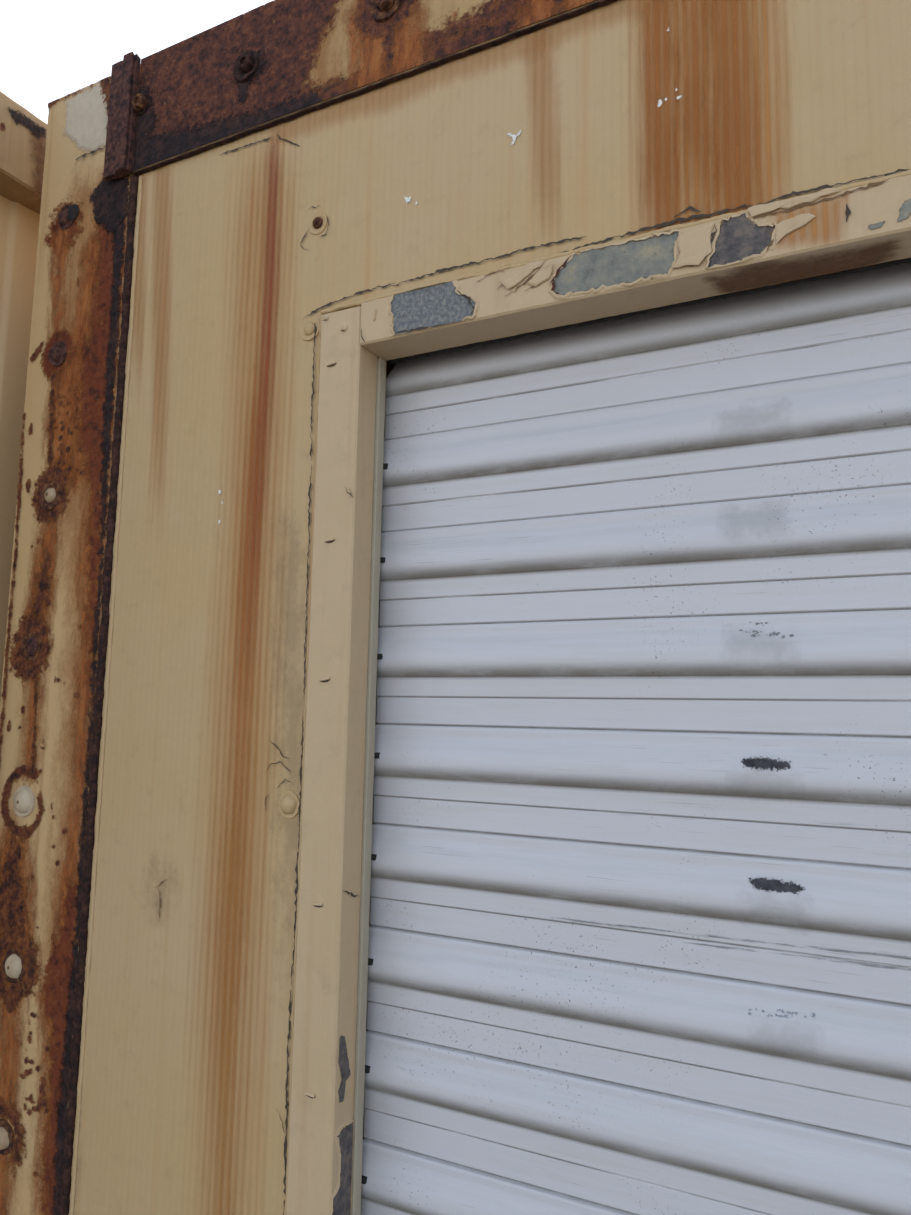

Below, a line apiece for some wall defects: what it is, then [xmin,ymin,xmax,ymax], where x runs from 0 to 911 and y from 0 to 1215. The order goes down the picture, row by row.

peeling [65,84,108,165]
rust [646,0,779,230]
peeling [388,179,888,336]
peeling [868,199,911,230]
rust [0,0,596,1215]
peeling [339,1036,350,1103]
peeling [331,1118,354,1215]